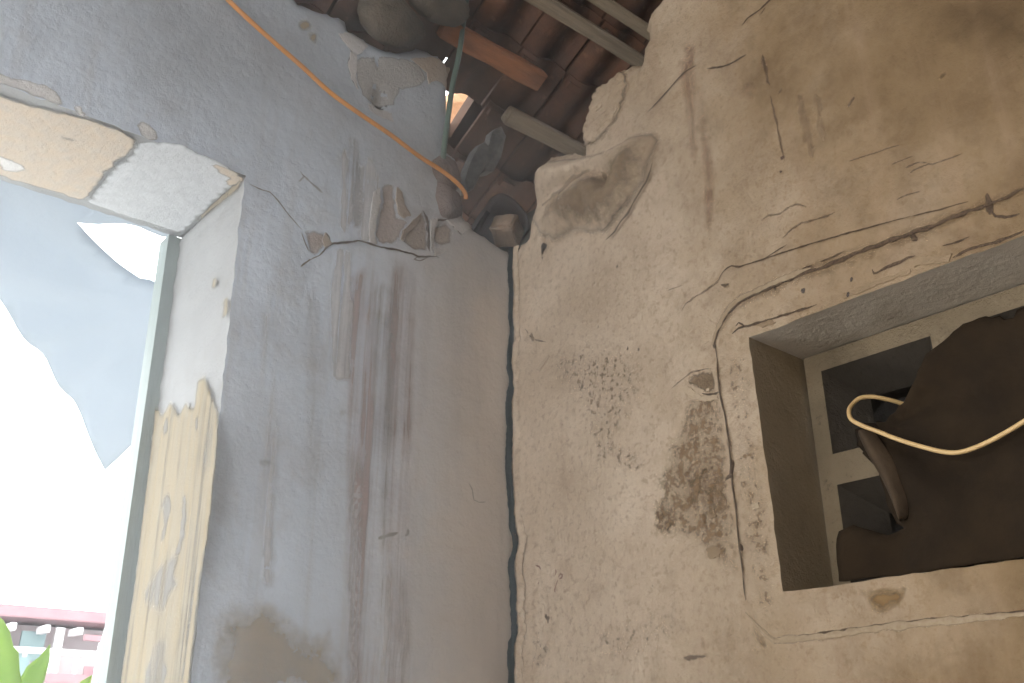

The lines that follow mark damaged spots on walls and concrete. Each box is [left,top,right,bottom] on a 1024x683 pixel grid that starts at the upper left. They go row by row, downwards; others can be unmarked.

flaking render [339,32,468,123]
crack [649,55,745,111]
peeling [0,96,133,199]
peeling [201,165,243,217]
spalling [306,232,332,253]
crack [250,184,439,267]
spalling [368,185,472,256]
crack [708,145,1024,644]
peeling [121,378,217,683]